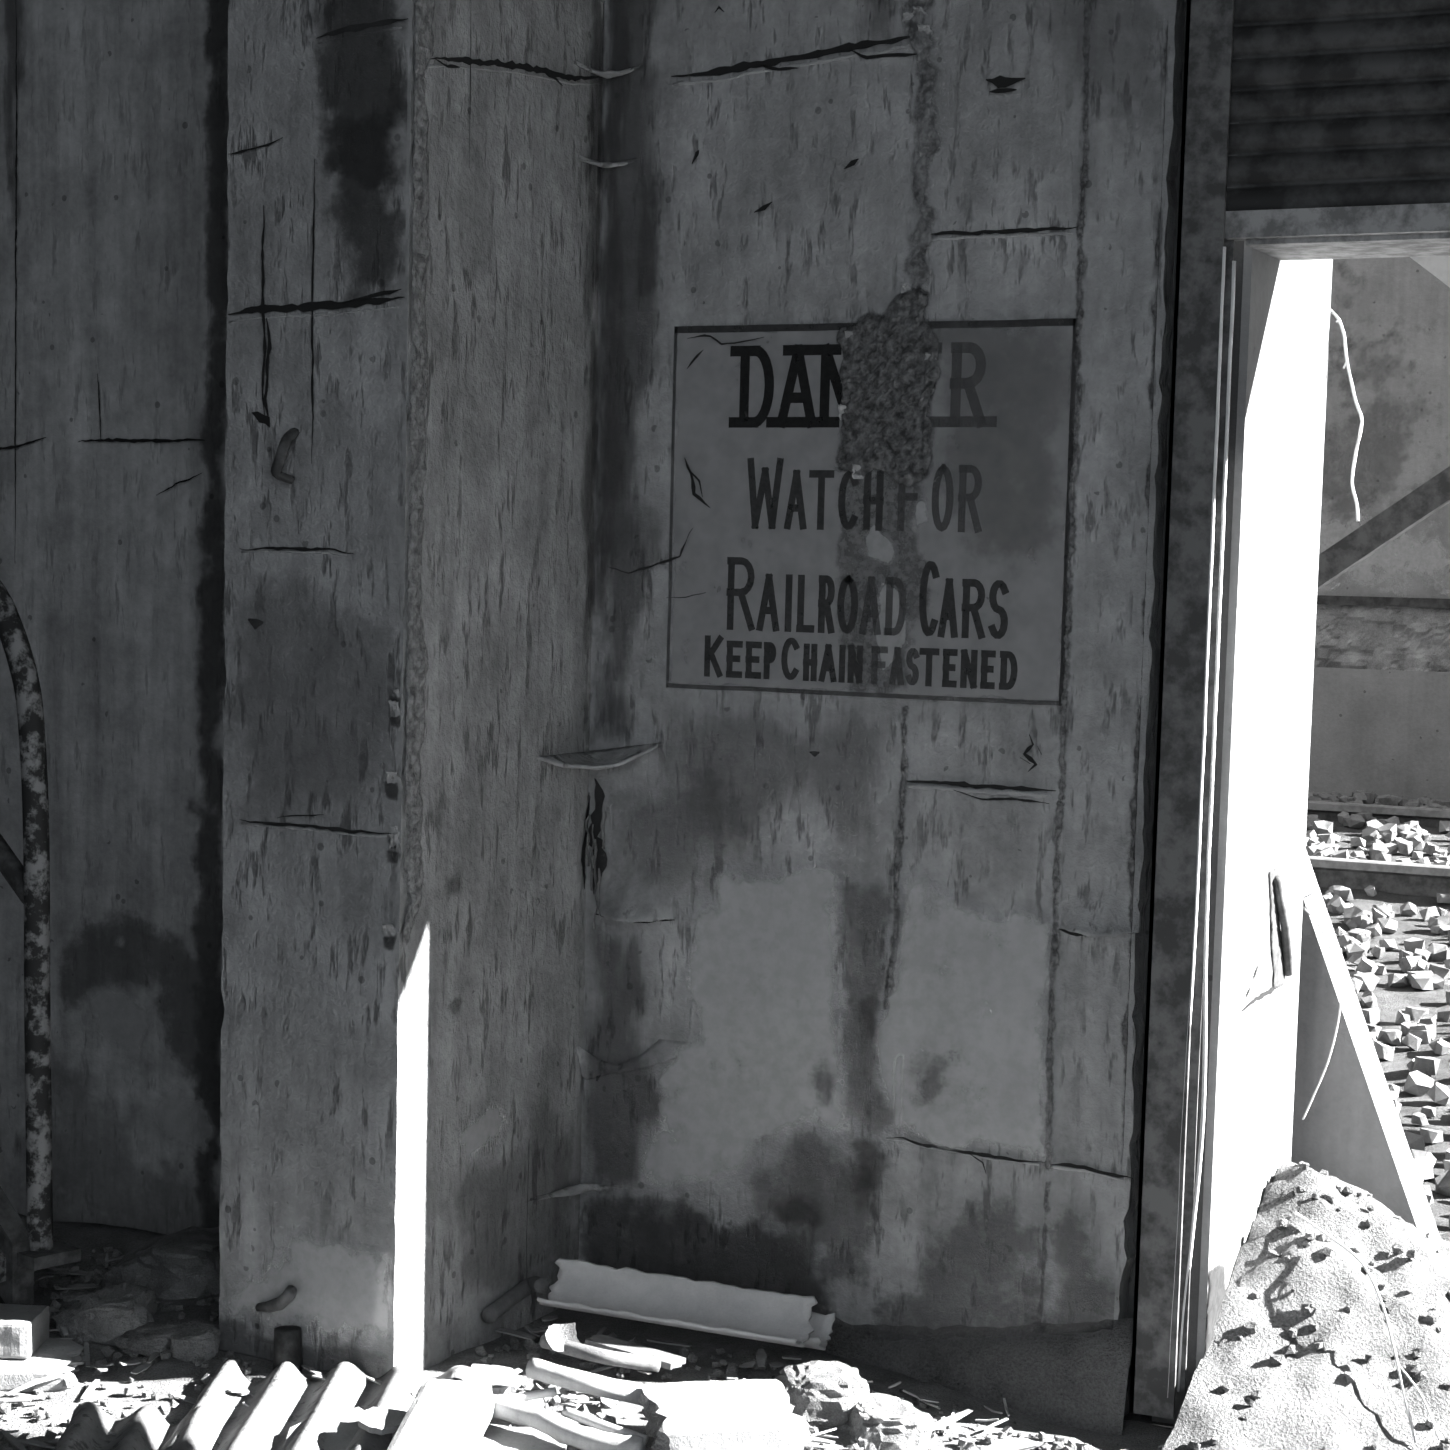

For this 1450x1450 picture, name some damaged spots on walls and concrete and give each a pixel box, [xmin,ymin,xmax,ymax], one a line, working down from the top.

crack [427,29,603,153]
crack [671,36,917,86]
leakage [585,0,655,673]
leakage [582,870,884,1315]
leakage [874,1206,1043,1341]
leakage [1053,1218,1113,1335]